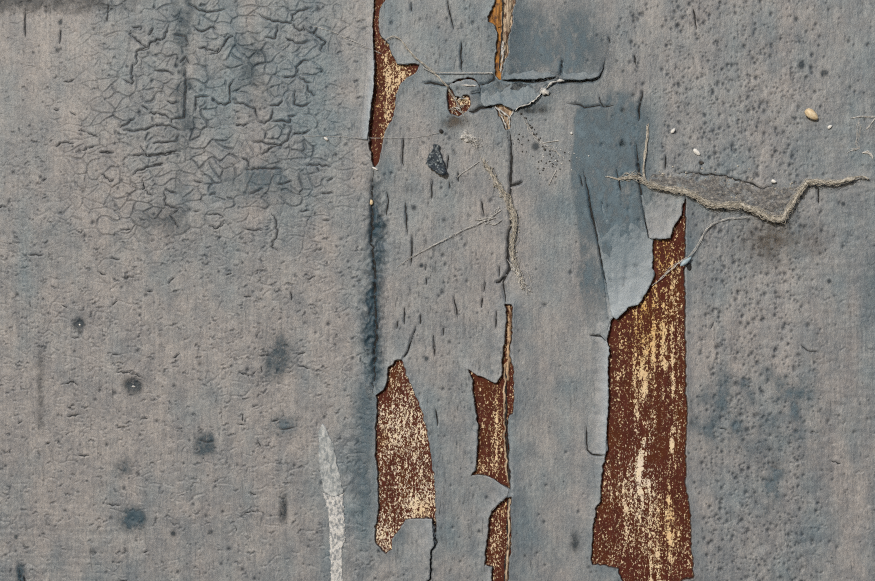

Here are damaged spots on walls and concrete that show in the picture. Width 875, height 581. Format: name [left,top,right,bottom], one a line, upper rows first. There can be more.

crack [54,4,326,230]
crack [246,213,279,252]
peeling [358,0,419,166]
peeling [375,360,436,581]
crack [370,170,458,393]
crack [425,1,463,86]
crack [431,149,459,198]
peeling [465,305,514,581]
crack [469,0,613,327]
crack [616,144,649,238]
peeling [587,192,693,581]
crack [665,156,770,189]